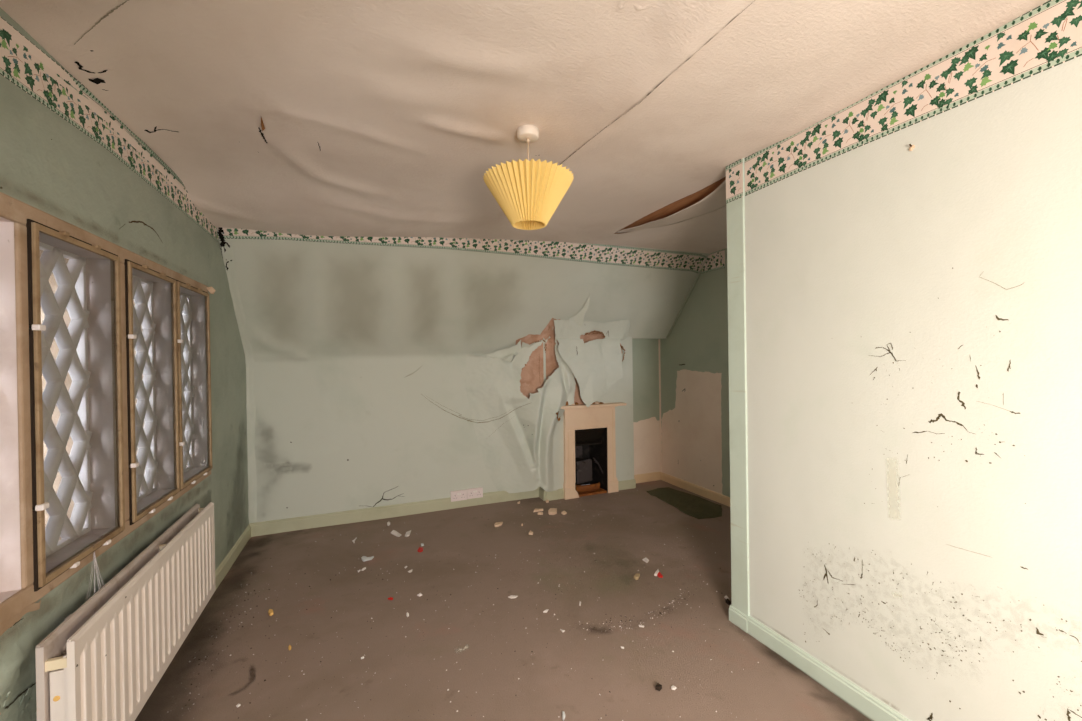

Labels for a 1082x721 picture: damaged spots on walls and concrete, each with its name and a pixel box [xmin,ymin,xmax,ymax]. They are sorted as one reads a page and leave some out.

flaking render [515,318,561,399]
flaking render [573,374,585,404]
flaking render [580,330,605,343]
flaking render [633,369,723,495]
water stain [799,546,1043,676]